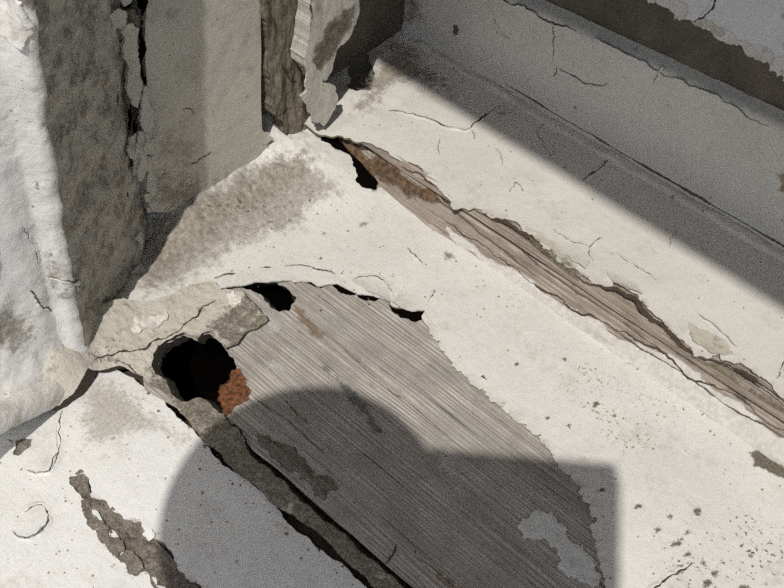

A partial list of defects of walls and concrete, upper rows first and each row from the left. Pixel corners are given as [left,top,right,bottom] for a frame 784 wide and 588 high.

peeling [647,0,784,78]
crack [494,0,768,128]
peeling [450,196,508,220]
peeling [520,223,651,307]
peeling [664,320,743,364]
corrosion [218,369,251,416]
peeling [772,380,784,399]
peeling [143,266,619,588]
crack [12,501,53,543]
spalling [69,469,207,588]
crack [646,560,693,588]